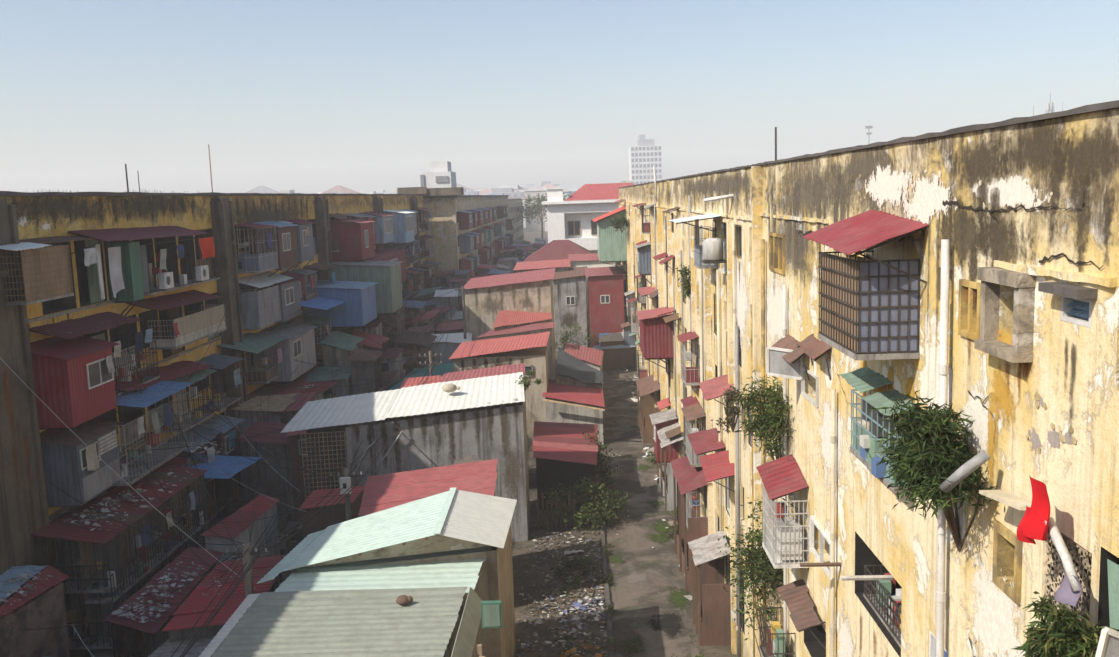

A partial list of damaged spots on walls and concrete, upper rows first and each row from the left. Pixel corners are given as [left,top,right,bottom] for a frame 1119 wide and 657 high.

damp [11,191,195,231]
damp [684,175,750,219]
damp [768,148,895,284]
flaking render [854,164,957,229]
flaking render [970,174,1053,212]
crack [942,191,1084,222]
damp [920,124,1118,324]
crack [1039,253,1104,270]
damp [354,399,522,496]